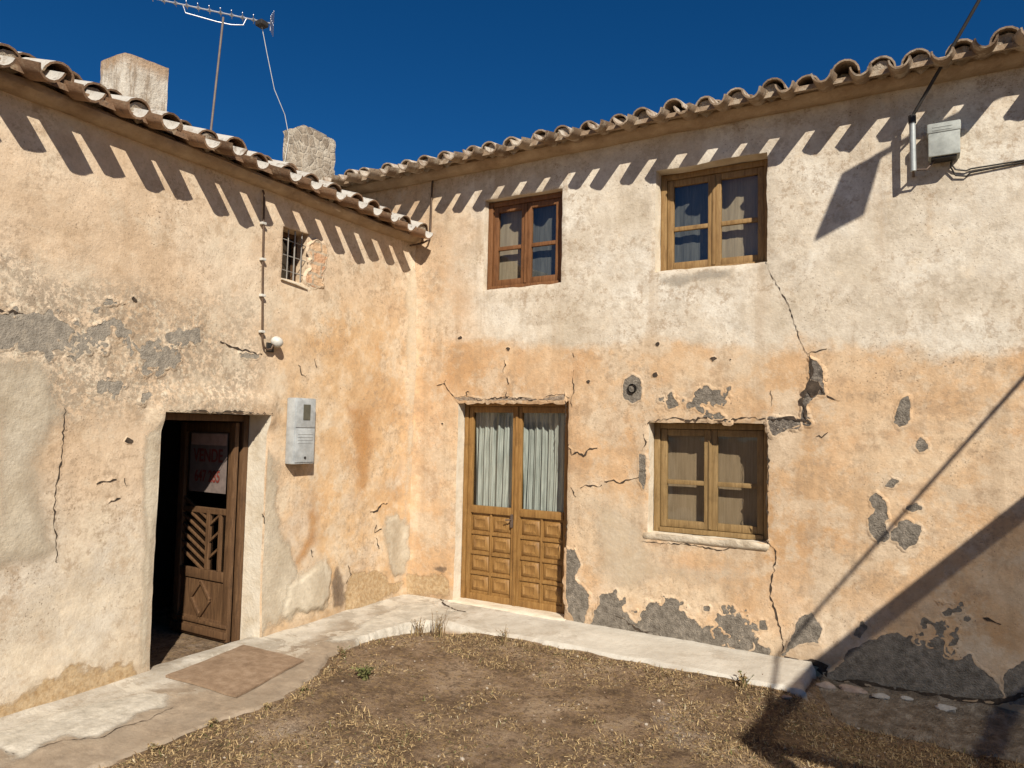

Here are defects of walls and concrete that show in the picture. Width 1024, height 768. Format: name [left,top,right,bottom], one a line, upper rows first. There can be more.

crack [53,407,70,562]
spalling [0,295,204,409]
crack [220,339,262,355]
crack [437,355,598,457]
crack [564,476,639,549]
spalling [636,452,650,492]
spalling [620,371,734,426]
crack [642,261,1024,705]
spalling [865,476,926,553]
spalling [891,392,932,455]
spalling [562,546,825,657]
spalling [819,587,1024,708]